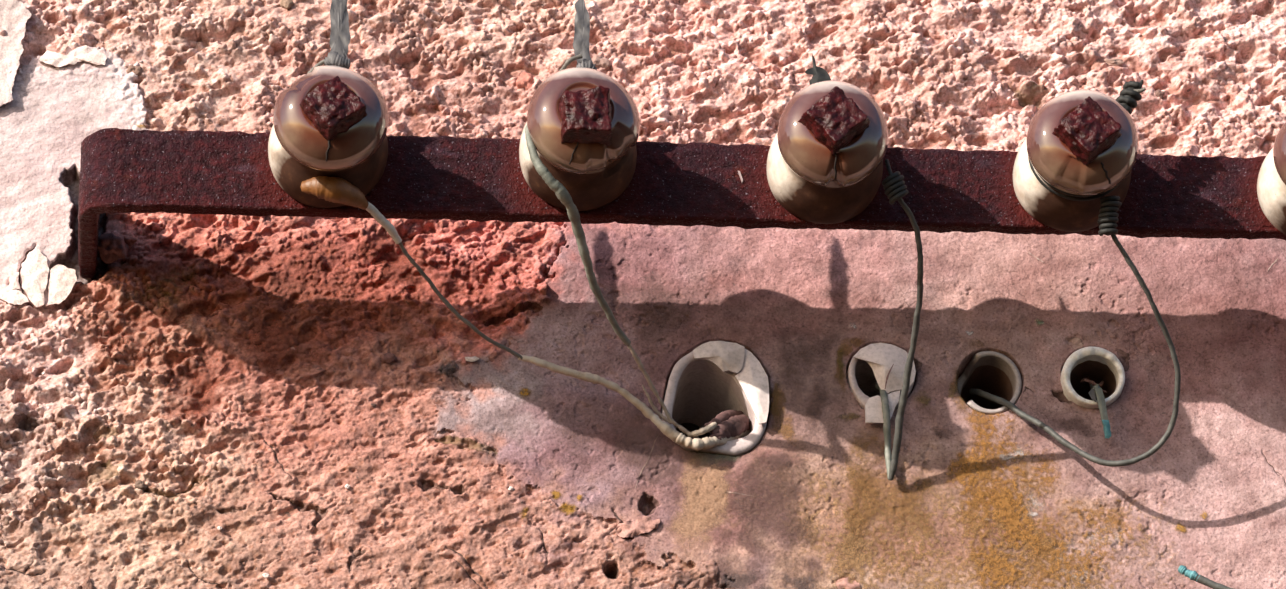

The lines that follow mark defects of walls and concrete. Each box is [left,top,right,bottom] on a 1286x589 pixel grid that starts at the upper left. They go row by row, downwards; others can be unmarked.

peeling [0,0,31,107]
peeling [38,45,107,67]
spalling [1013,81,1051,108]
peeling [0,166,109,308]
spalling [483,301,543,326]
flaking render [1116,349,1130,371]
spalling [1052,391,1071,404]
flaking render [434,435,497,454]
spalling [418,480,465,495]
damp [673,452,805,545]
peeling [604,493,660,570]
damp [719,574,765,589]